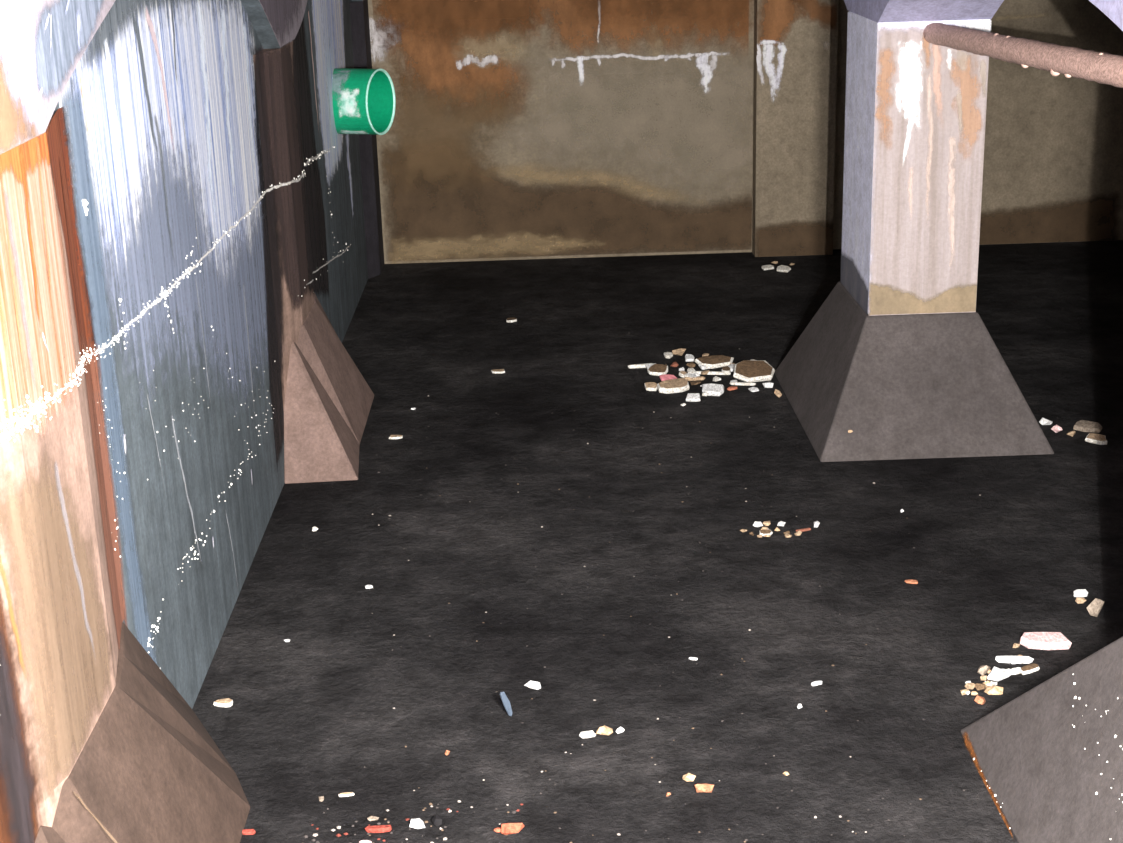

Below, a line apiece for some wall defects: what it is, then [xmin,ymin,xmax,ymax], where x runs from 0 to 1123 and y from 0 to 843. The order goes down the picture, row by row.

corrosion [0,67,126,648]
crack [0,146,351,446]
leakage [0,0,353,663]
corrosion [375,0,837,108]
leakage [518,27,787,185]
leakage [384,81,977,315]
efflorescence [896,41,923,161]
corrosion [869,27,989,316]
leakage [979,195,1118,245]
crack [182,403,274,568]
corrosion [0,595,38,843]
crack [147,599,164,669]